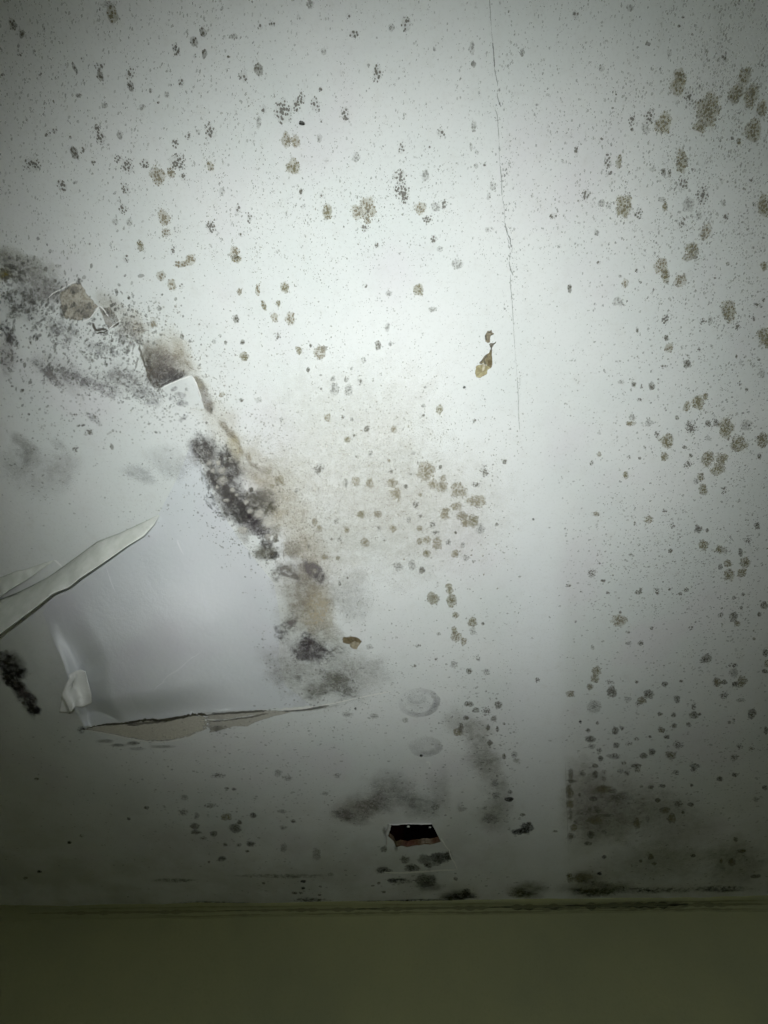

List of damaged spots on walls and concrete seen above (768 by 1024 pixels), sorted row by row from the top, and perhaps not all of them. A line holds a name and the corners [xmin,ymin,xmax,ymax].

mould [669,69,767,144]
mould [661,149,709,205]
peeling [49,281,121,334]
mould [621,258,687,291]
peeling [137,340,212,412]
mould [654,393,768,494]
peeling [0,515,159,634]
mould [192,434,340,660]
mould [694,523,760,581]
mould [0,652,40,714]
mould [553,696,701,845]
spalling [385,823,438,841]